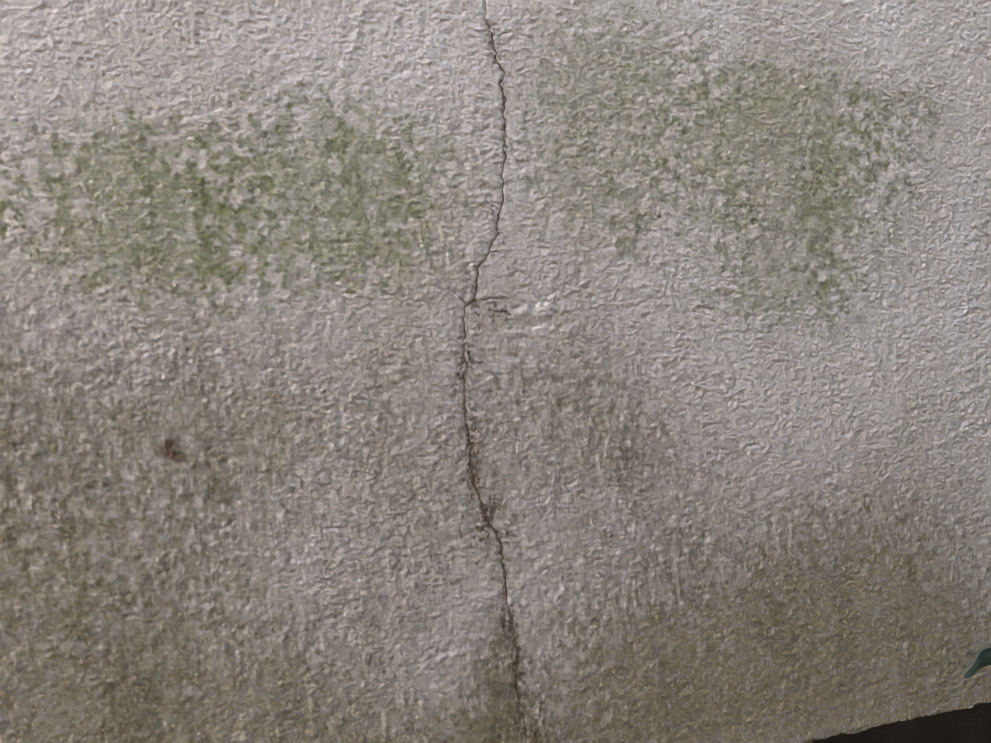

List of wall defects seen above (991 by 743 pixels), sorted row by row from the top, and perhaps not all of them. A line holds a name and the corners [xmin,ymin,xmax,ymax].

crack [451,1,538,743]